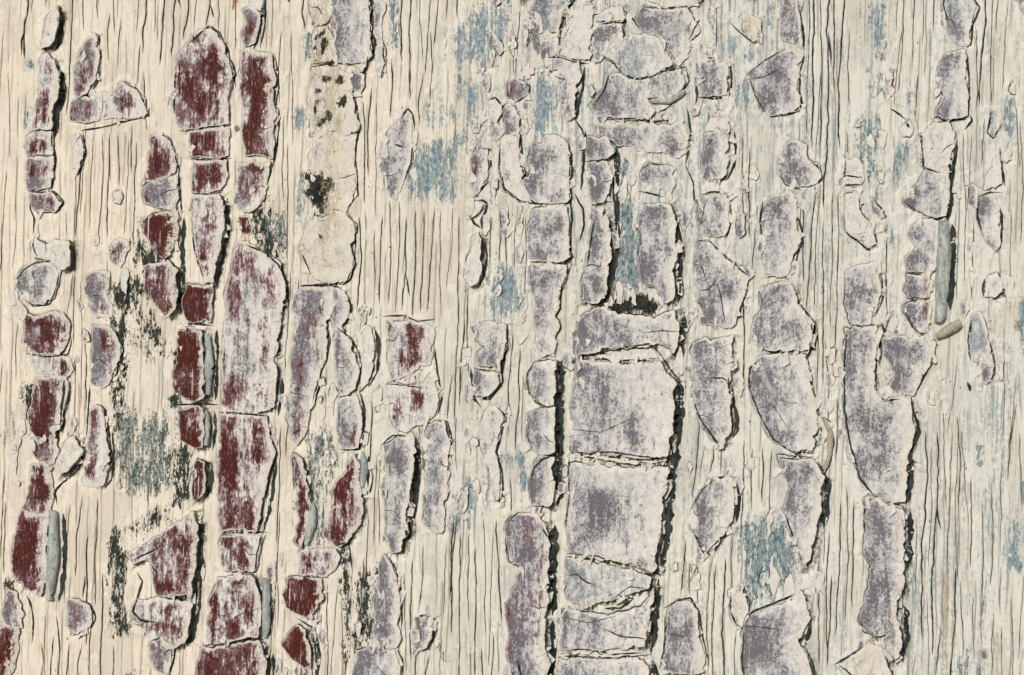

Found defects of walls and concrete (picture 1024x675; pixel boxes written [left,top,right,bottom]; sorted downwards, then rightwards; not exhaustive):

peeling [0,5,150,675]
crack [41,498,114,675]
water stain [104,229,199,639]
crack [66,0,305,388]
peeling [129,0,512,675]
crack [356,0,469,470]
crack [404,476,512,675]
crack [681,425,772,675]
peeling [464,0,1005,675]
crack [802,0,850,460]
peeling [964,142,1012,251]
peeling [967,266,1015,303]